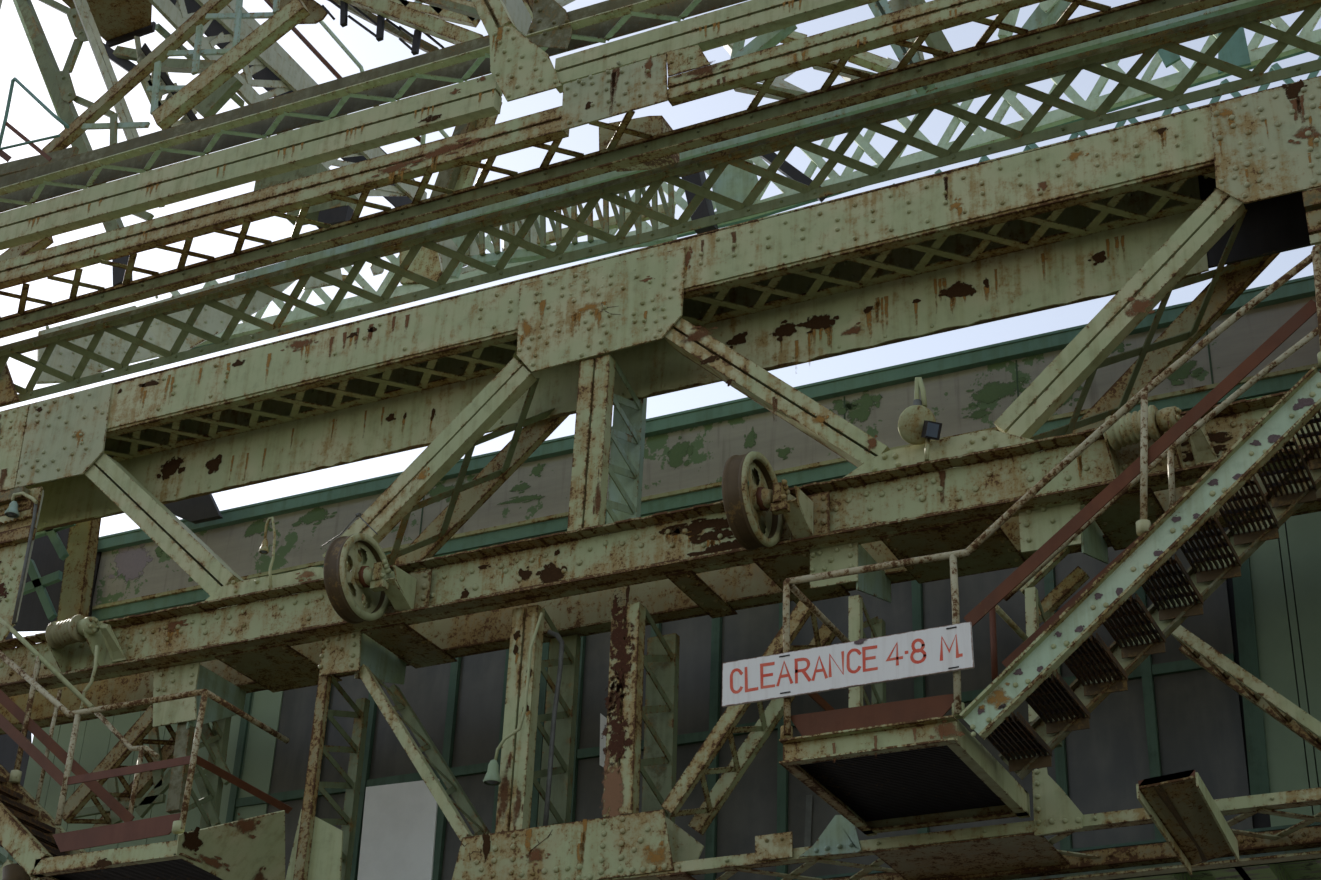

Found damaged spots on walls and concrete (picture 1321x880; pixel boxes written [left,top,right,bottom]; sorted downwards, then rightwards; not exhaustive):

rust [1282,79,1321,163]
rust [912,269,997,322]
rust [769,296,888,363]
peeling [829,390,883,424]
peeling [963,377,1028,419]
peeling [667,436,693,468]
peeling [744,427,757,449]
rust [659,517,742,557]
peeling [109,543,170,583]
rust [478,550,567,584]
rust [601,586,635,766]
rust [182,827,230,871]